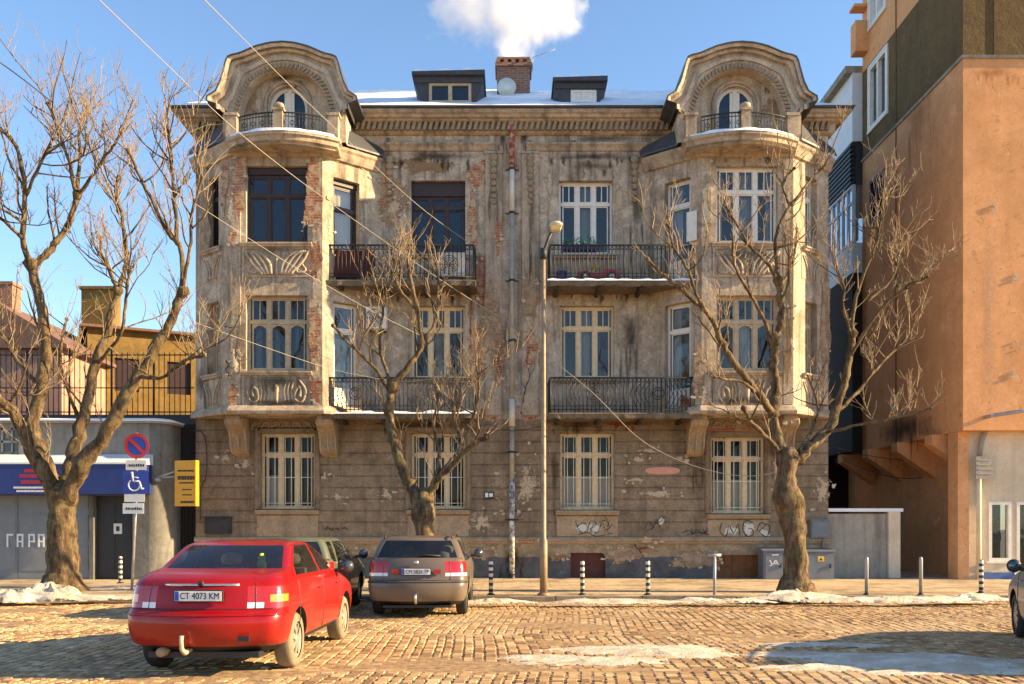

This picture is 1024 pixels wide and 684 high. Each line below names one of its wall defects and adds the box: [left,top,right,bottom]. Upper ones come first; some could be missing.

flaking render [220,156,248,247]
flaking render [301,157,337,406]
flaking render [336,155,507,387]
flaking render [469,507,497,532]
flaking render [514,441,541,518]
flaking render [601,536,667,564]
flaking render [669,550,724,570]
flaking render [810,471,836,511]